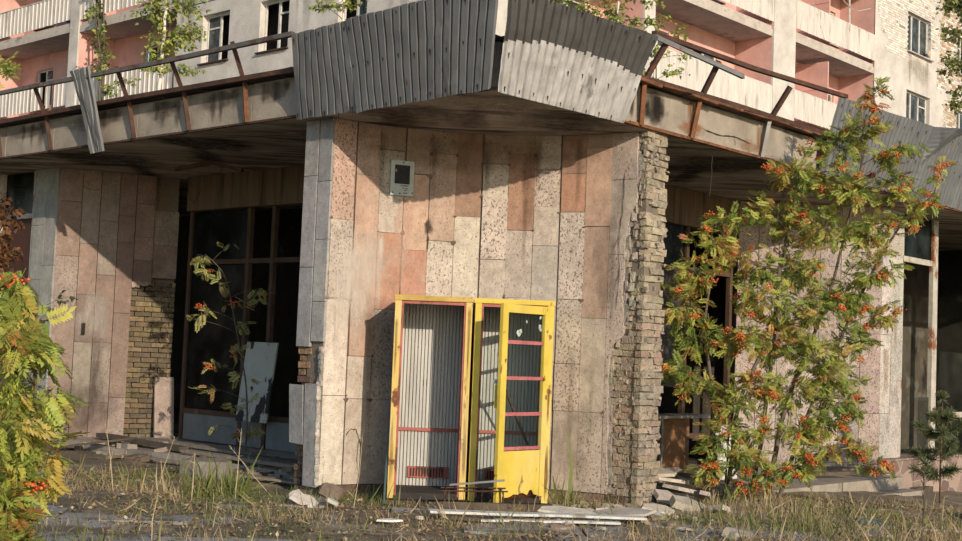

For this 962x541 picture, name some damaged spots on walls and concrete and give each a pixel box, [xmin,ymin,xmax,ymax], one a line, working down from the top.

leakage [631,93,664,121]
leakage [162,138,245,161]
spalling [123,281,176,437]